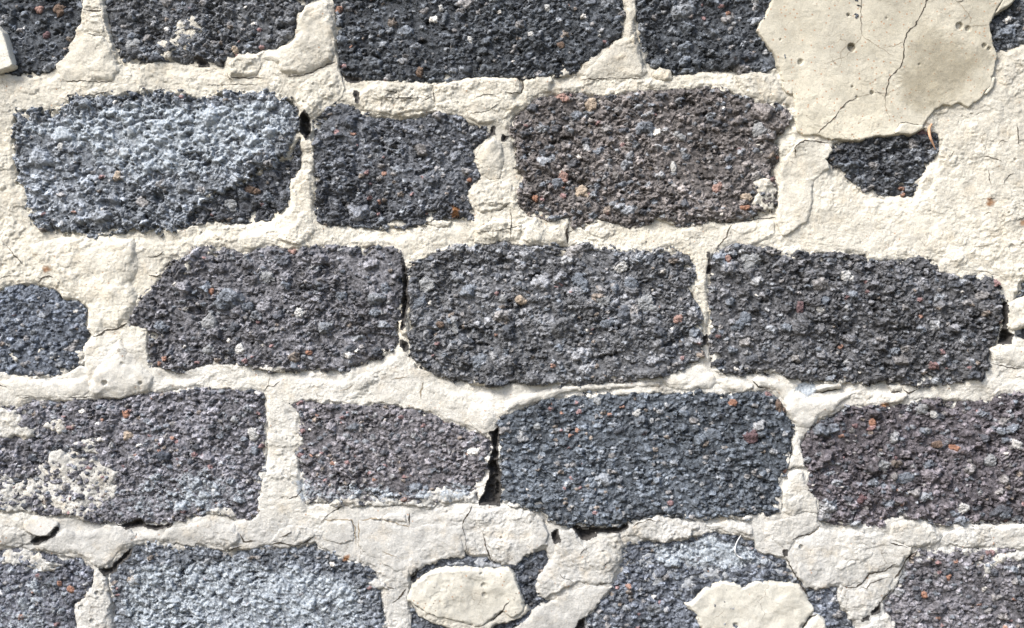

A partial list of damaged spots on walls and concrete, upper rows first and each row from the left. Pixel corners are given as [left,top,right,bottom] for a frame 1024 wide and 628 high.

crack [794,0,928,153]
spalling [717,123,939,250]
crack [227,506,410,550]
crack [462,507,492,561]
crack [785,529,818,627]
crack [847,543,917,603]